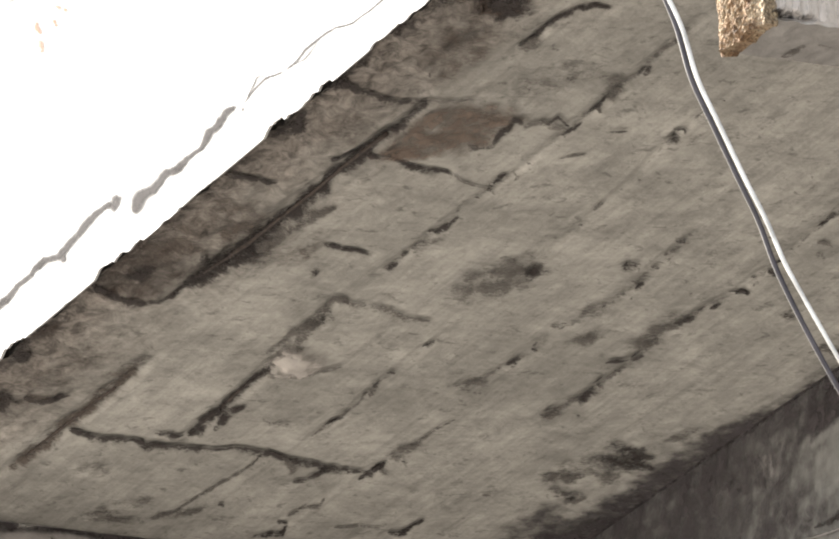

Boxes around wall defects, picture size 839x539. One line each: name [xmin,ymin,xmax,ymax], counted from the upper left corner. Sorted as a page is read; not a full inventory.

crack [518,3,611,53]
crack [337,79,473,105]
crack [0,0,382,310]
leakage [453,255,549,301]
crack [69,420,454,512]
leakage [512,367,839,539]
leakage [0,521,145,539]
leakage [151,507,205,520]
crack [251,499,325,538]
crack [334,519,424,537]